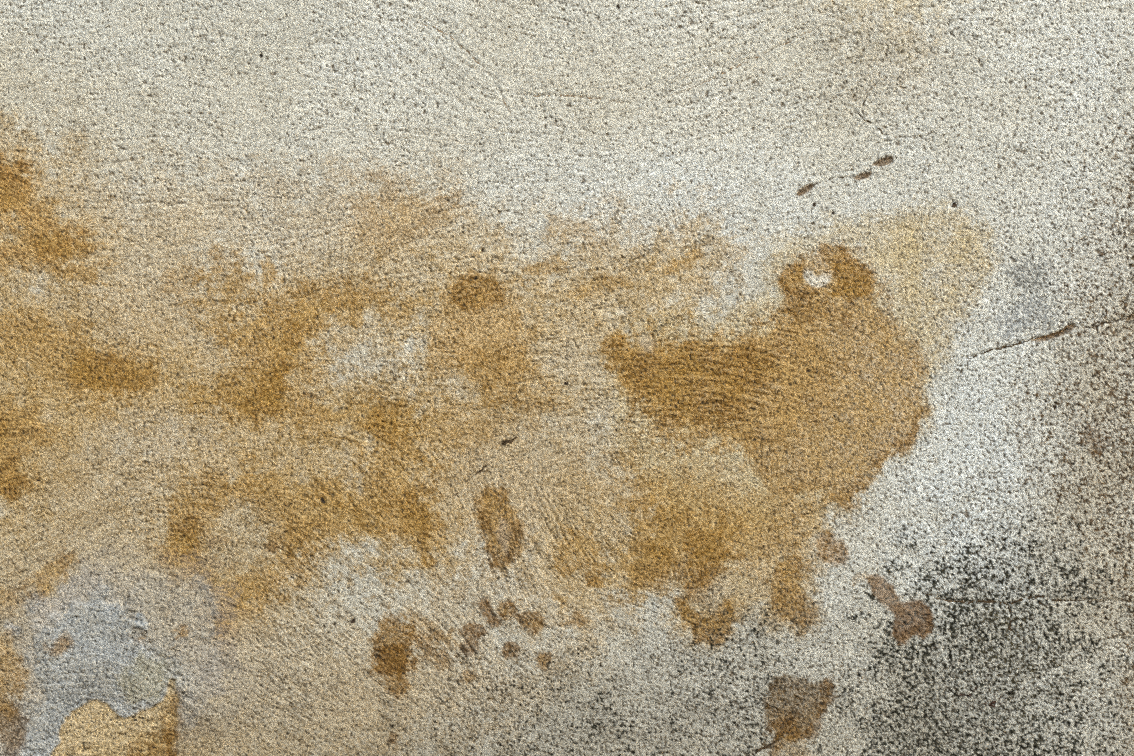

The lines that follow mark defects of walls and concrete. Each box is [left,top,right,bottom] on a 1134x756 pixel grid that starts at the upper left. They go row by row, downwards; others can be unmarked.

crack [795,98,896,198]
leakage [0,87,1007,756]
crack [966,312,1134,359]
peeling [0,505,287,756]
leakage [814,345,1134,756]